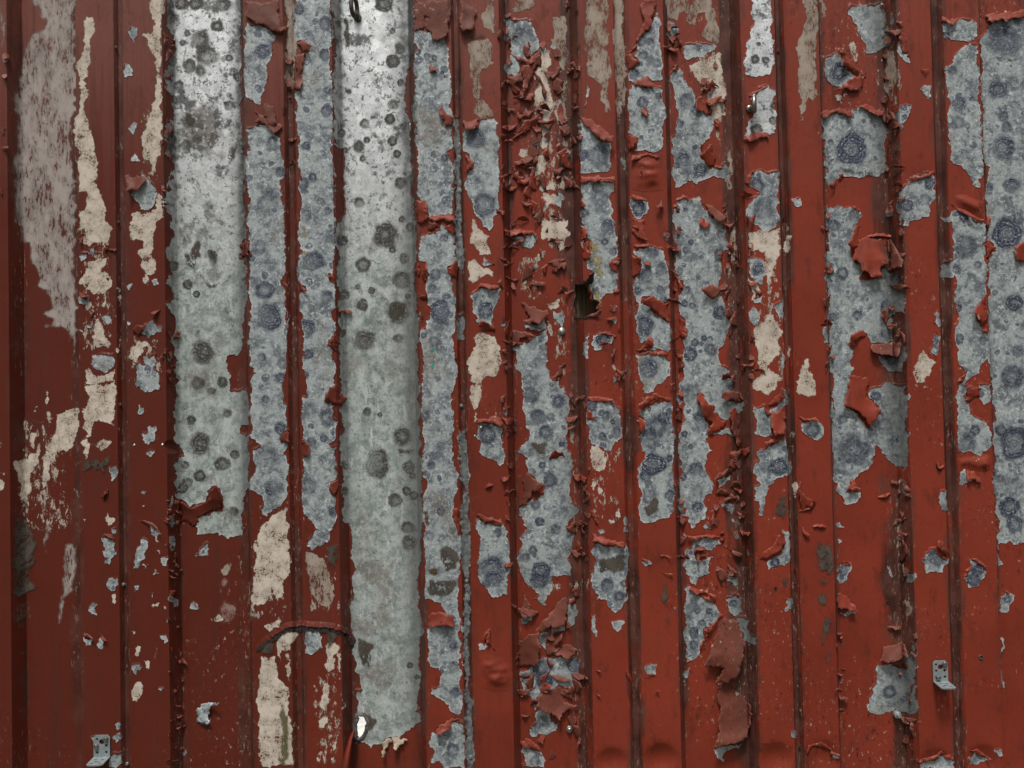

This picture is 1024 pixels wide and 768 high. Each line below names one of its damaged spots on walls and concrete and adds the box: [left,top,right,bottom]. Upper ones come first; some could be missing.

peeling [1,0,133,542]
peeling [123,0,942,768]
peeling [938,9,1024,566]